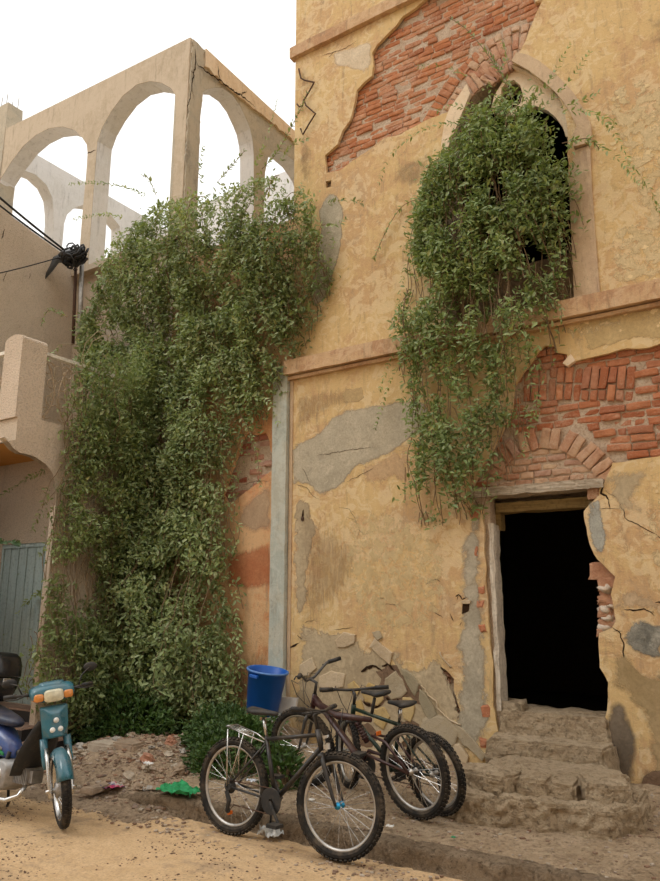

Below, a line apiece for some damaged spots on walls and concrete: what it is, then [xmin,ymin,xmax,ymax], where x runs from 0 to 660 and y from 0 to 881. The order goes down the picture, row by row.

crack [187,52,253,117]
flaking render [327,0,540,172]
flaking render [475,345,660,509]
crack [599,488,660,538]
spalling [588,562,616,637]
flaking render [296,625,487,763]